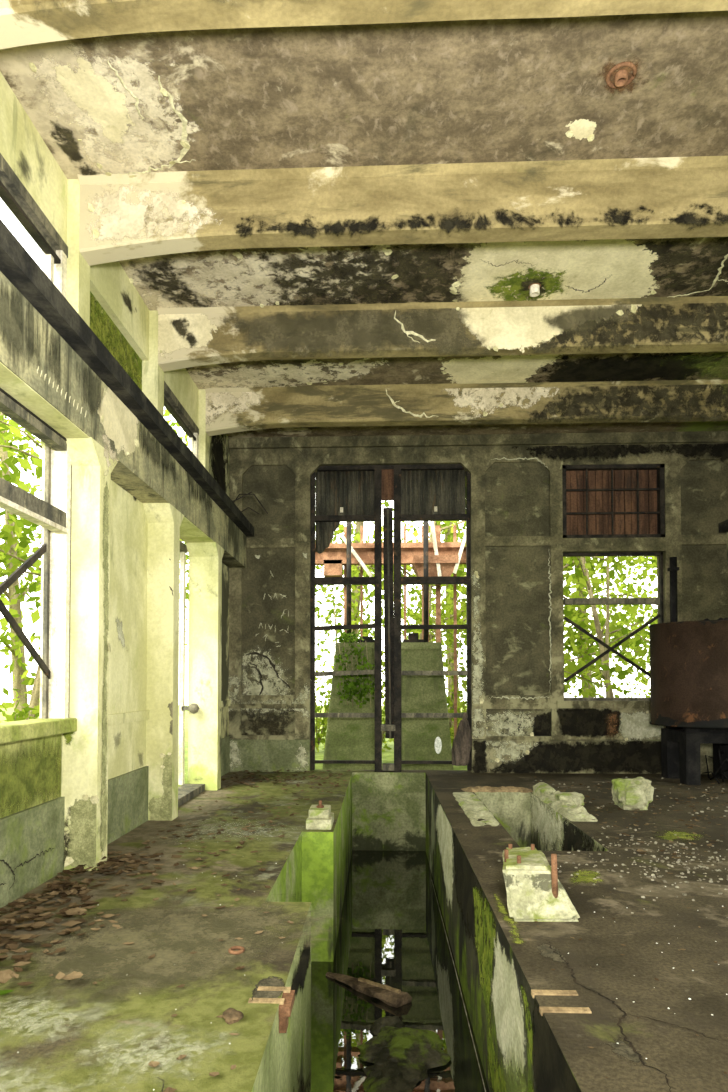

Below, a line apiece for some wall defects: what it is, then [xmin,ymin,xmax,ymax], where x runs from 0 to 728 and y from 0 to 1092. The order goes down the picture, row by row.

peeling [29,43,221,246]
corrosion [599,59,638,93]
water stain [225,209,582,357]
crack [394,311,435,343]
peeling [437,239,659,417]
water stain [528,204,728,423]
crack [669,254,728,297]
crack [386,390,438,418]
water stain [491,443,728,468]
water stain [489,553,552,700]
peeling [619,711,664,741]
crack [545,940,718,1092]